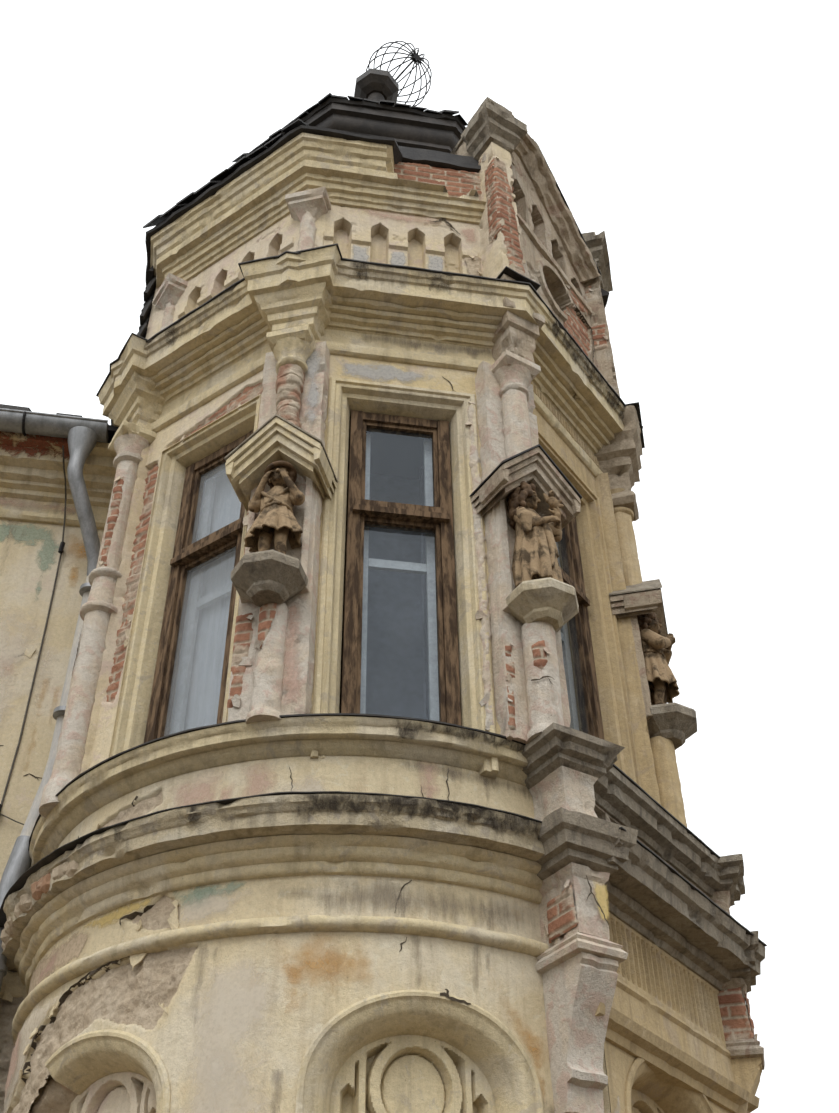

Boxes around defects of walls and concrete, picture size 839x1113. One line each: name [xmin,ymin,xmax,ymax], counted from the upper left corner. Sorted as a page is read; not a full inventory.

flaking render [394,153,526,276]
leakage [298,794,540,837]
flaking render [0,860,79,950]
flaking render [544,879,579,944]
crack [586,875,610,929]
flaking render [0,882,243,1113]